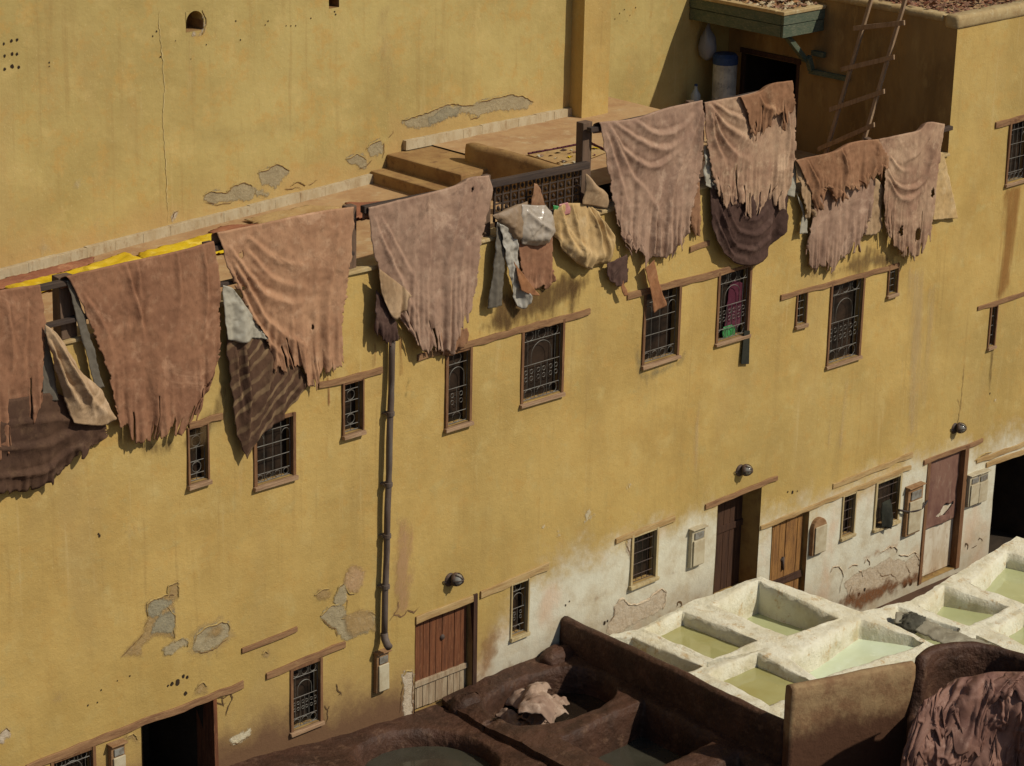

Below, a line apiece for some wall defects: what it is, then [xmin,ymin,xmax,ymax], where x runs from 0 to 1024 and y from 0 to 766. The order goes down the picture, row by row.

flaking render [346,94,534,169]
flaking render [204,163,314,205]
flaking render [123,581,230,656]
flaking render [315,566,376,640]
flaking render [604,588,667,635]